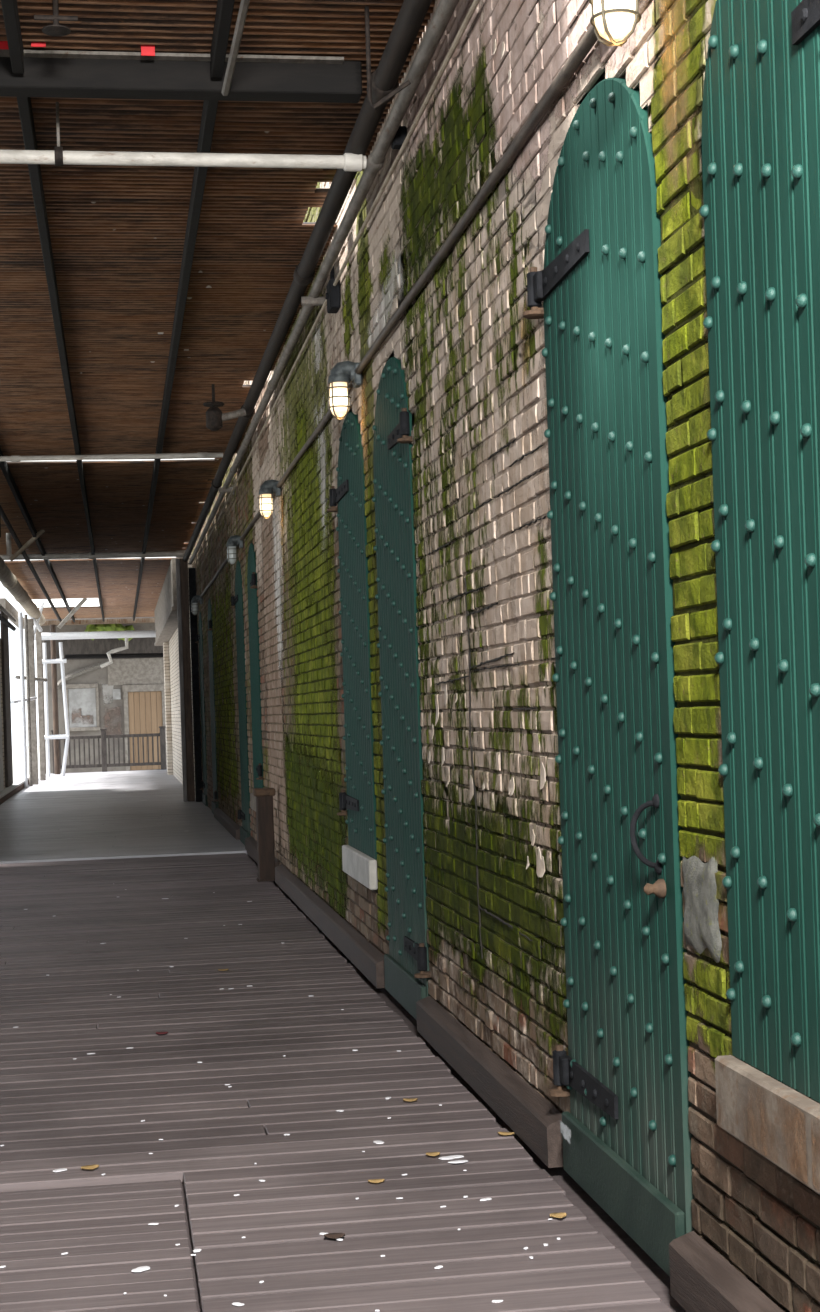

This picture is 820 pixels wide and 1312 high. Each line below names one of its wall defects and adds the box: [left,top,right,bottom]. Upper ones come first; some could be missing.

damp [316,412,326,523]
peeling [408,215,558,878]